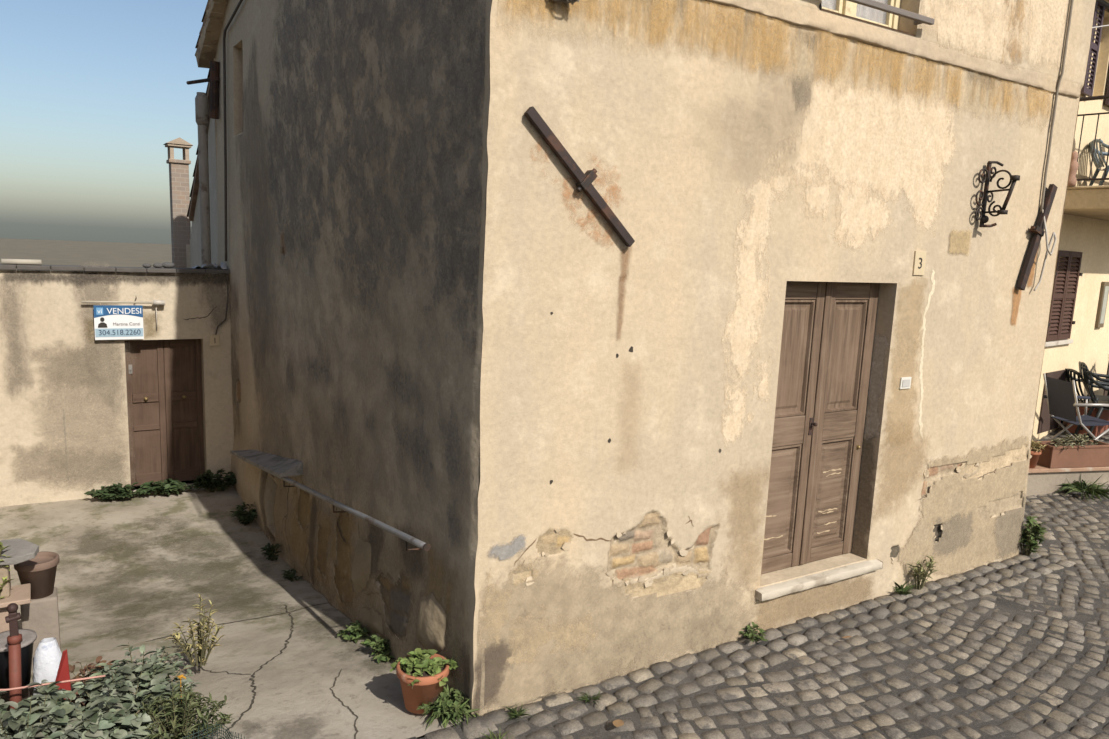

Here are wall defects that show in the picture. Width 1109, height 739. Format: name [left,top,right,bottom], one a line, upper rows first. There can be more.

water stain [500,0,1049,126]
water stain [238,0,485,311]
corrosion [619,248,628,329]
water stain [4,271,237,484]
spalling [334,509,353,608]
spalling [373,569,415,642]
spalling [509,528,574,586]
spalling [606,510,720,598]
peeling [890,436,1032,577]
crack [330,669,358,739]